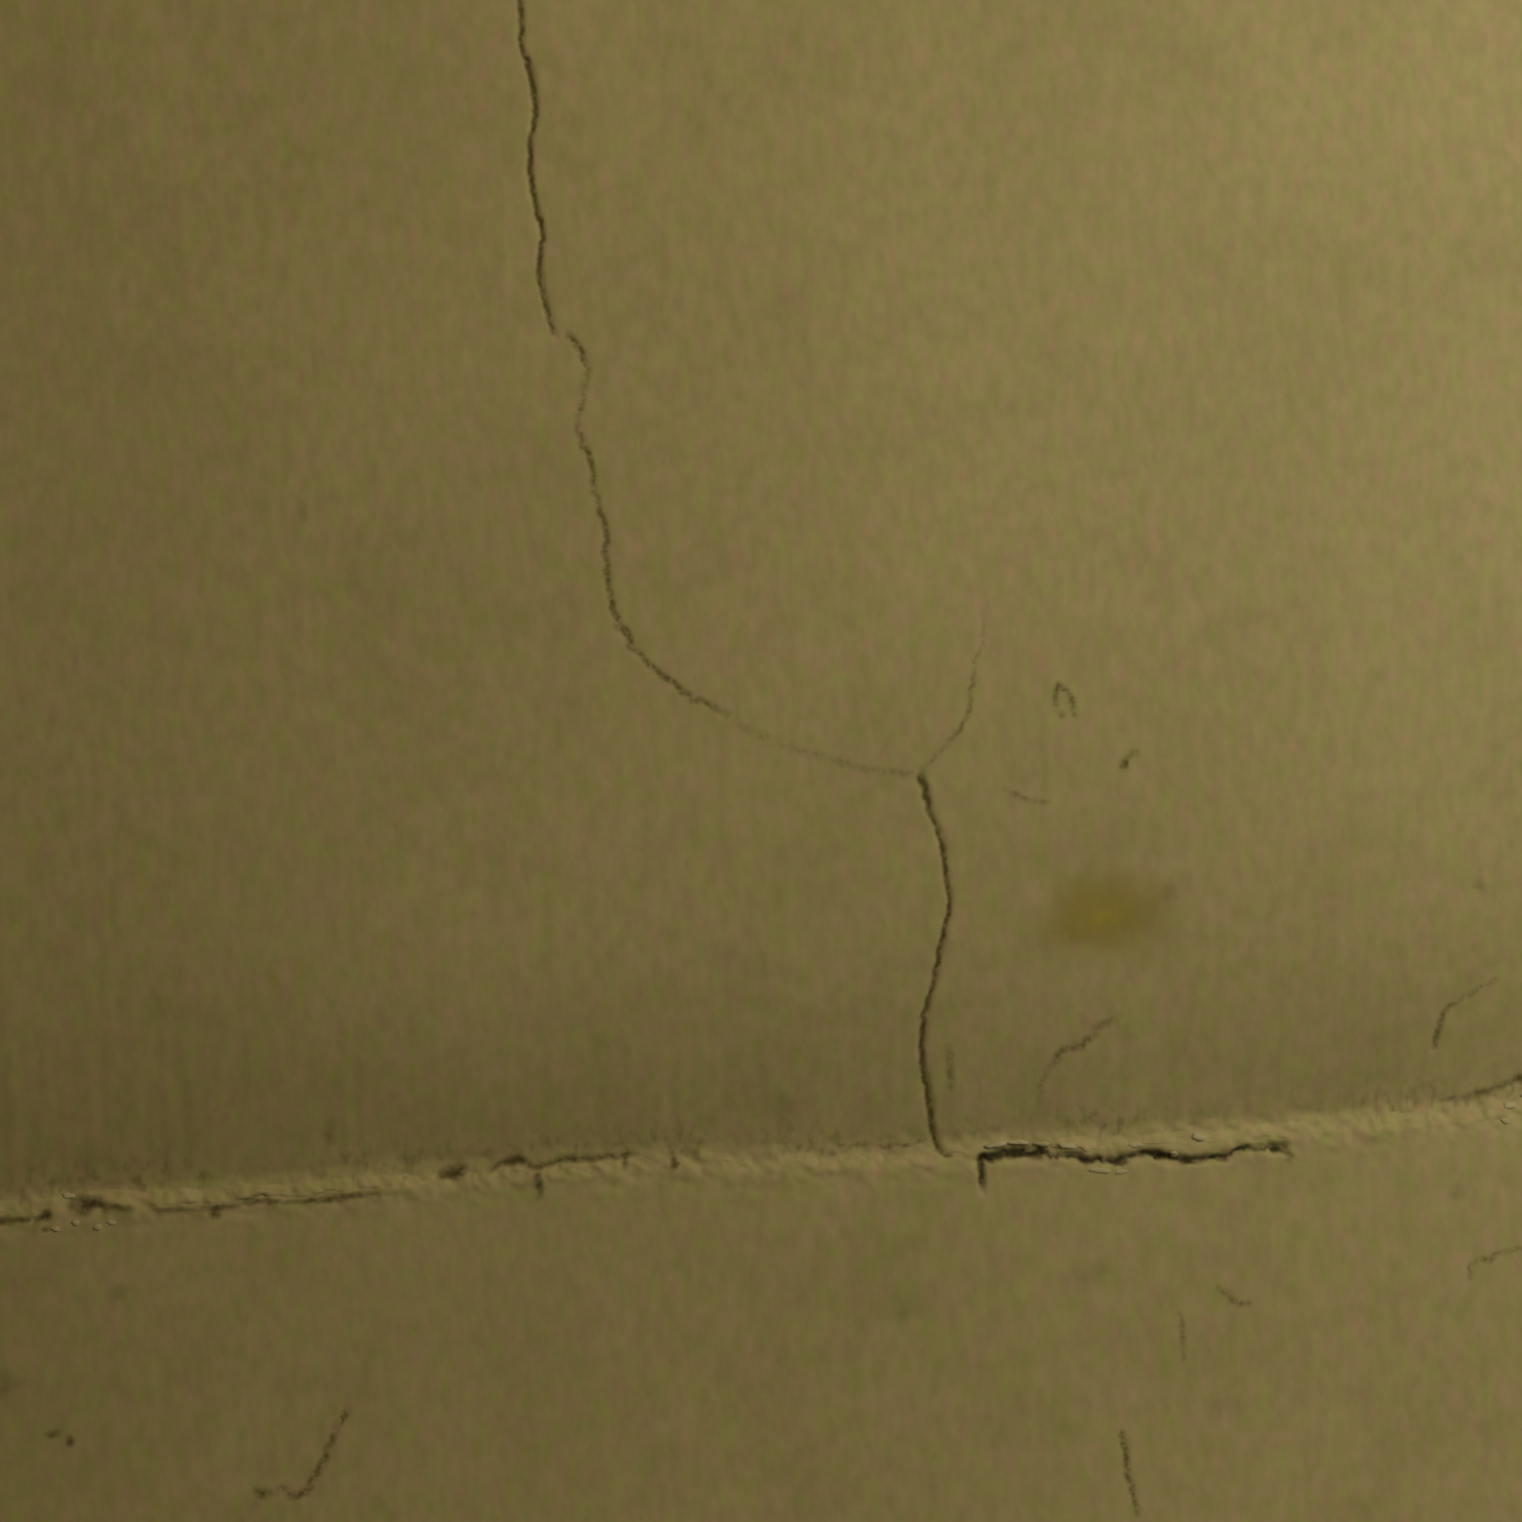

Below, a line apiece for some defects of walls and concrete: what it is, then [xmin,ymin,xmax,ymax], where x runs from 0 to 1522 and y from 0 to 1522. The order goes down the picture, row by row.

crack [519,0,584,361]
crack [906,776,951,1149]
crack [0,1212,60,1232]
crack [505,1157,602,1187]